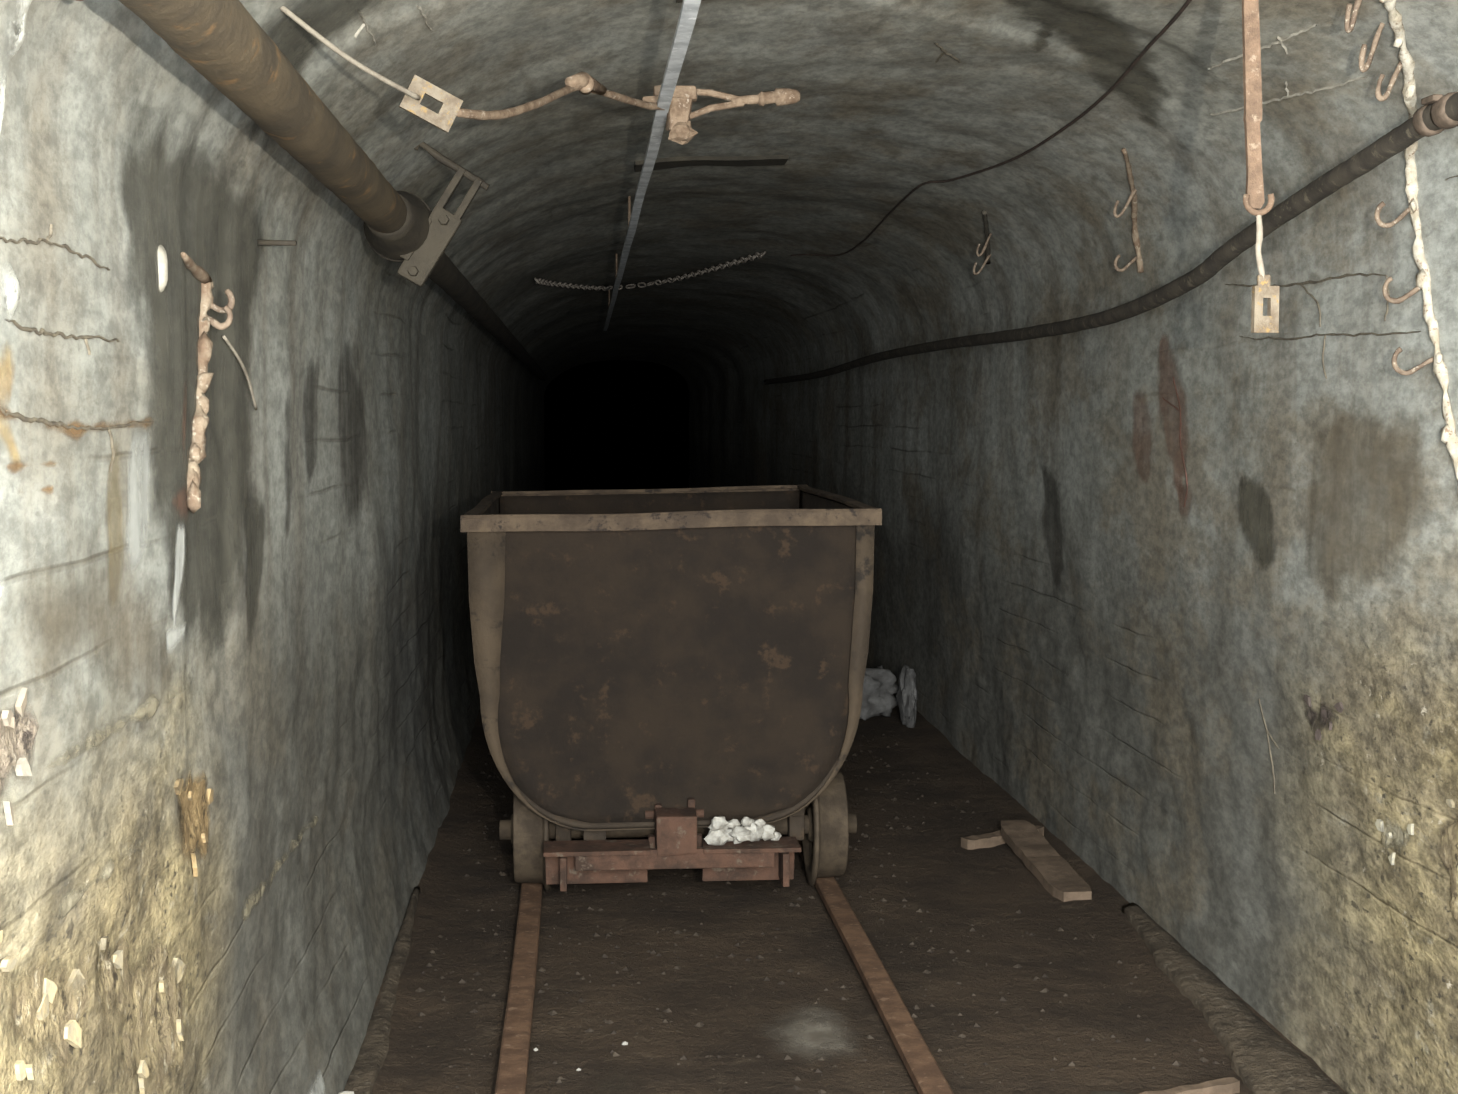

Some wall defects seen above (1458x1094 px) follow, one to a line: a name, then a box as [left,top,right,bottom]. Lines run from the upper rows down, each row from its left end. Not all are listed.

crack [0,224,110,271]
crack [6,319,120,355]
crack [1225,273,1421,379]
crack [0,406,152,472]
damp [94,130,264,687]
damp [1309,417,1420,585]
spalling [0,688,39,825]